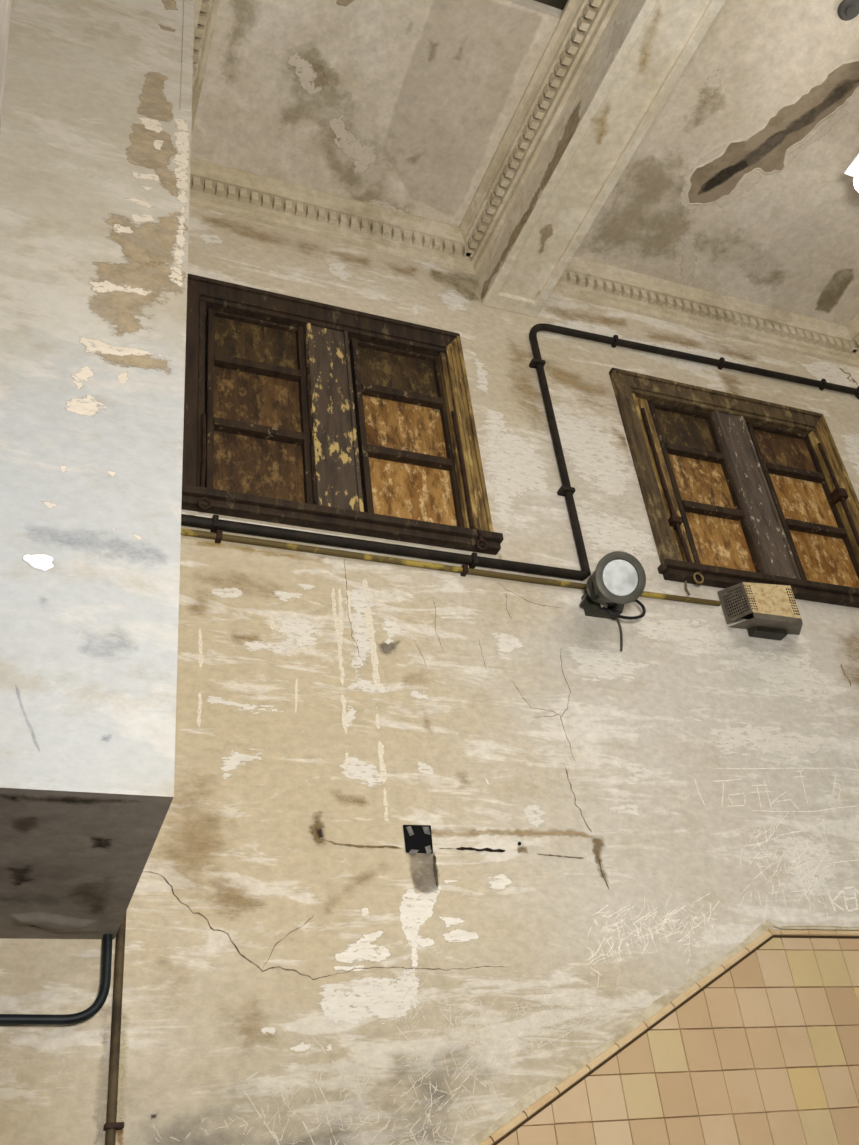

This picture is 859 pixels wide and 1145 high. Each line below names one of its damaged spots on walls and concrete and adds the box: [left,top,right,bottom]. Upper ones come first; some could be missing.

water stain [287,52,328,95]
water stain [329,113,377,176]
flaking render [685,58,859,206]
peeling [113,118,222,287]
peeling [89,280,152,296]
peeling [65,337,166,416]
peeling [236,584,322,660]
peeling [344,579,405,693]
peeling [219,748,262,779]
crack [513,653,592,832]
crack [151,872,503,980]
peeling [317,880,480,1026]